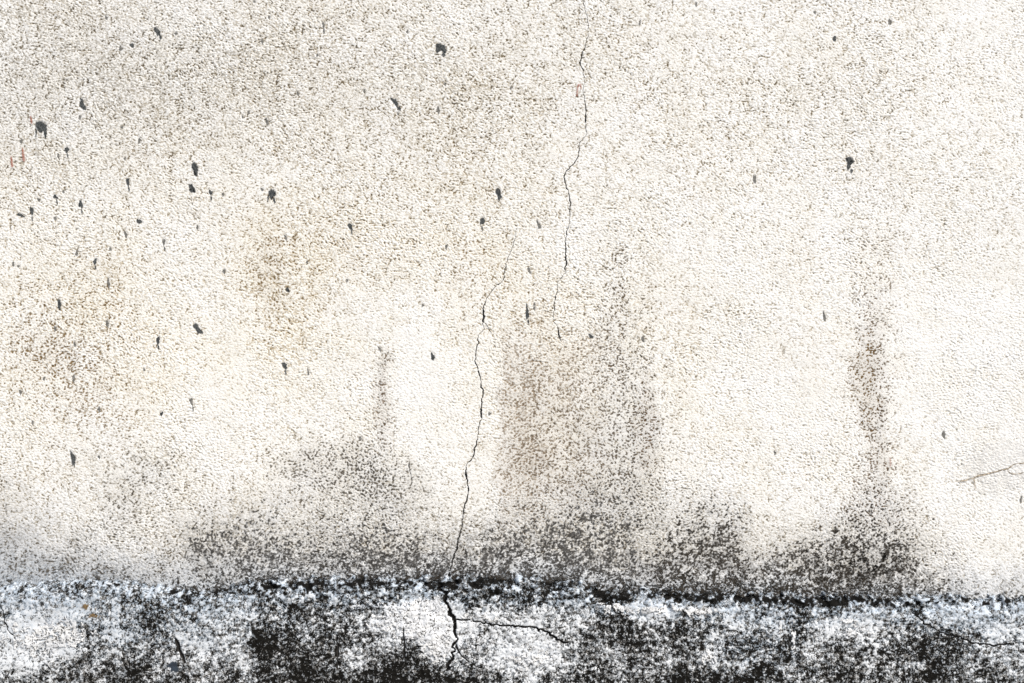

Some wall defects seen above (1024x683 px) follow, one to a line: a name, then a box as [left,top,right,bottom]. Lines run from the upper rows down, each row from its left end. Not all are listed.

crack [553,2,589,340]
leakage [0,277,990,618]
crack [437,236,573,671]
crack [959,463,1024,488]